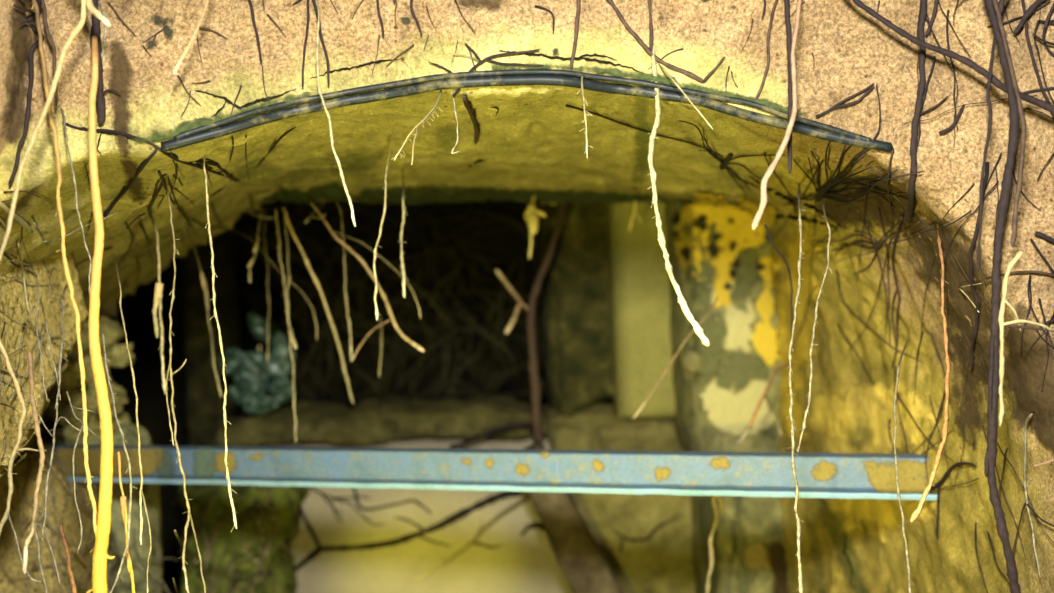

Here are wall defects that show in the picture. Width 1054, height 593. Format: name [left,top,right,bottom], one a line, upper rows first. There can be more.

peeling [675,192,936,455]
corrosion [515,463,530,476]
corrosion [593,459,605,472]
corrosion [655,467,671,482]
corrosion [710,457,730,469]
corrosion [811,460,838,481]
corrosion [864,460,934,494]
peeling [828,492,935,543]